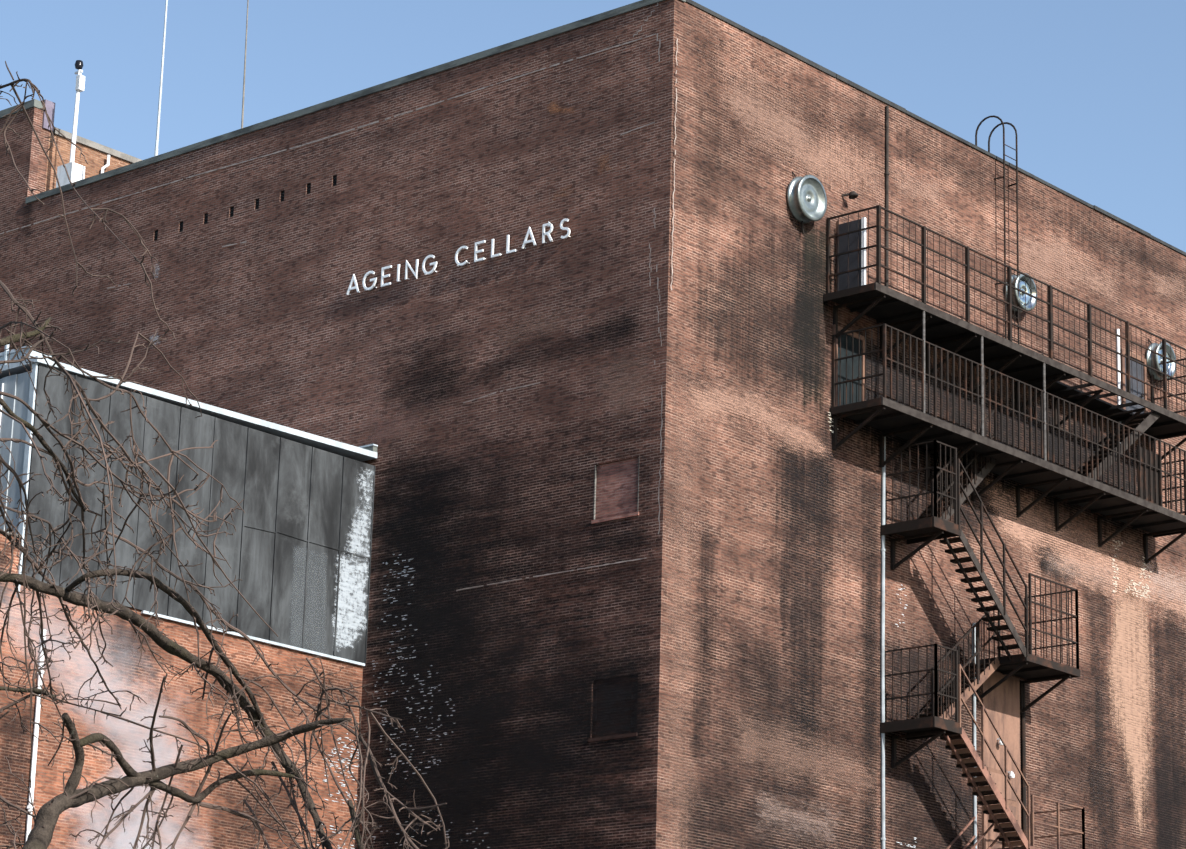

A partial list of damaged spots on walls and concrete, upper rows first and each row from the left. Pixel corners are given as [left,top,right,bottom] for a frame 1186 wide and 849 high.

leakage [694,224,838,433]
peeling [292,470,372,653]
leakage [372,554,455,779]
leakage [776,447,833,759]
leakage [1085,540,1186,849]